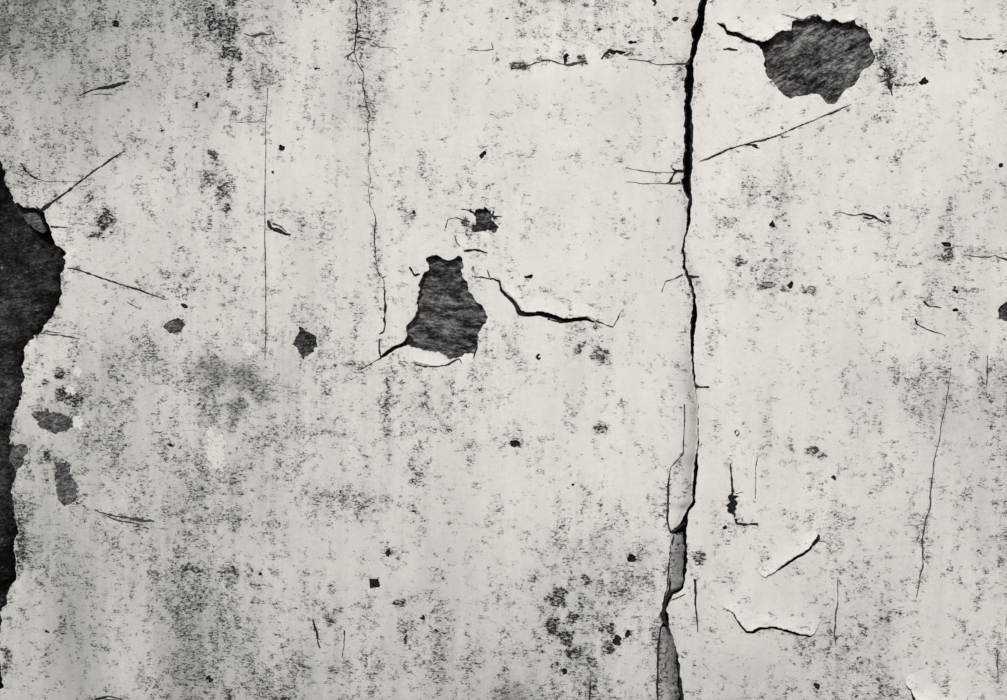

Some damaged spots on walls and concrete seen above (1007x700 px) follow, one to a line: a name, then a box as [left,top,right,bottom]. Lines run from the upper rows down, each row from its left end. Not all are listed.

spalling [717,7,901,104]
spalling [408,208,502,368]
crack [472,270,621,328]
spalling [998,302,1007,321]
crack [511,0,851,700]
spalling [31,408,74,434]
spalling [9,444,28,471]
peeling [714,531,821,637]
peeling [906,665,1007,700]